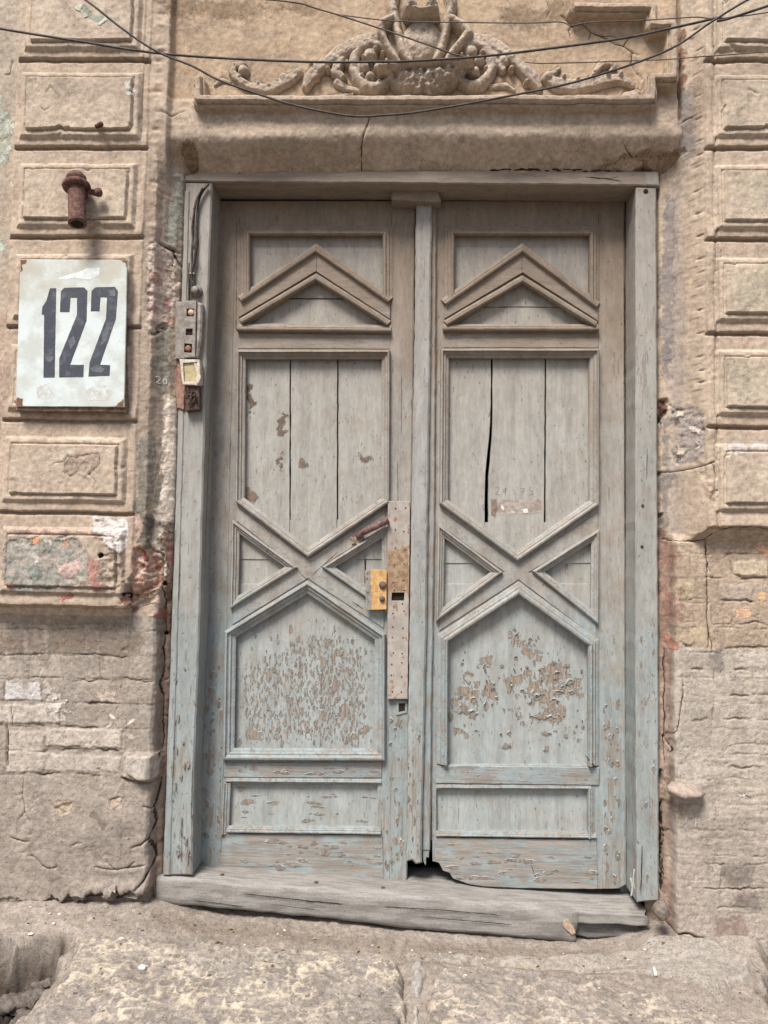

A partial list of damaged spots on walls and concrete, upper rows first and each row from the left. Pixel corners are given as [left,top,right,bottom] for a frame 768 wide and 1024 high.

flaking render [657,400,706,465]
peeling [1,528,107,602]
crack [98,578,171,887]
peeling [238,623,373,748]
peeling [448,626,585,752]